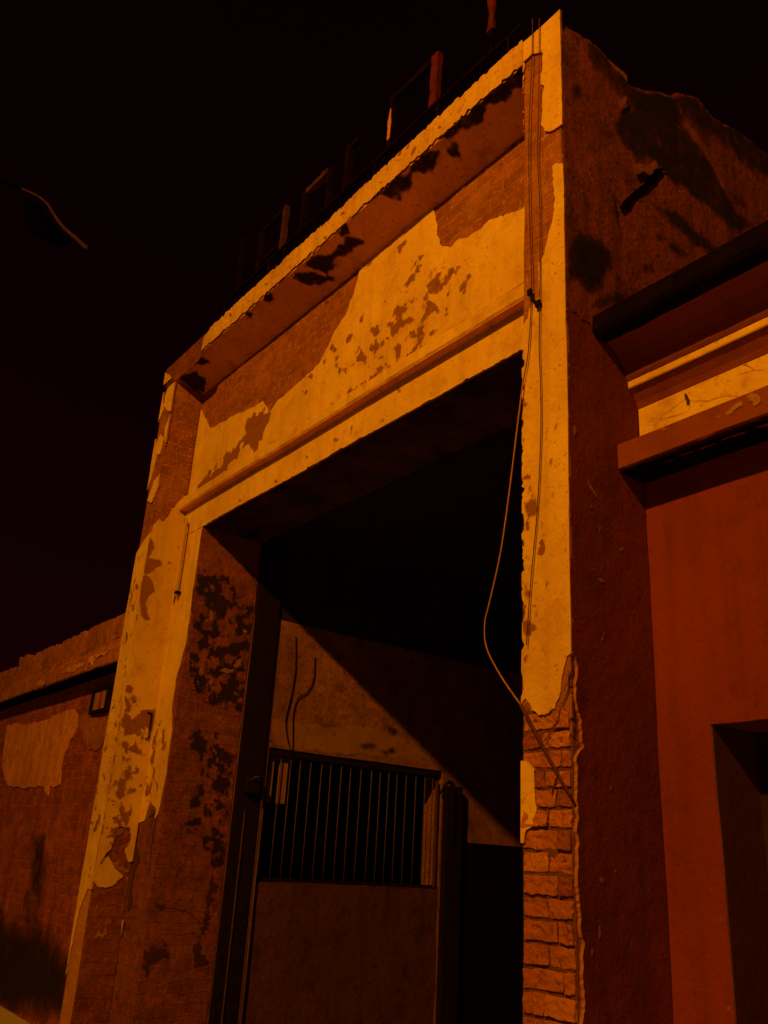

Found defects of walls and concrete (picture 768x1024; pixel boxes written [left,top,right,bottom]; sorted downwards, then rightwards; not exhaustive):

flaking render [435,53,562,332]
water stain [569,232,622,304]
water stain [590,43,768,229]
flaking render [128,254,471,620]
flaking render [522,474,537,546]
flaking render [523,585,536,635]
flaking render [2,569,254,1024]
flaking render [521,655,579,1024]